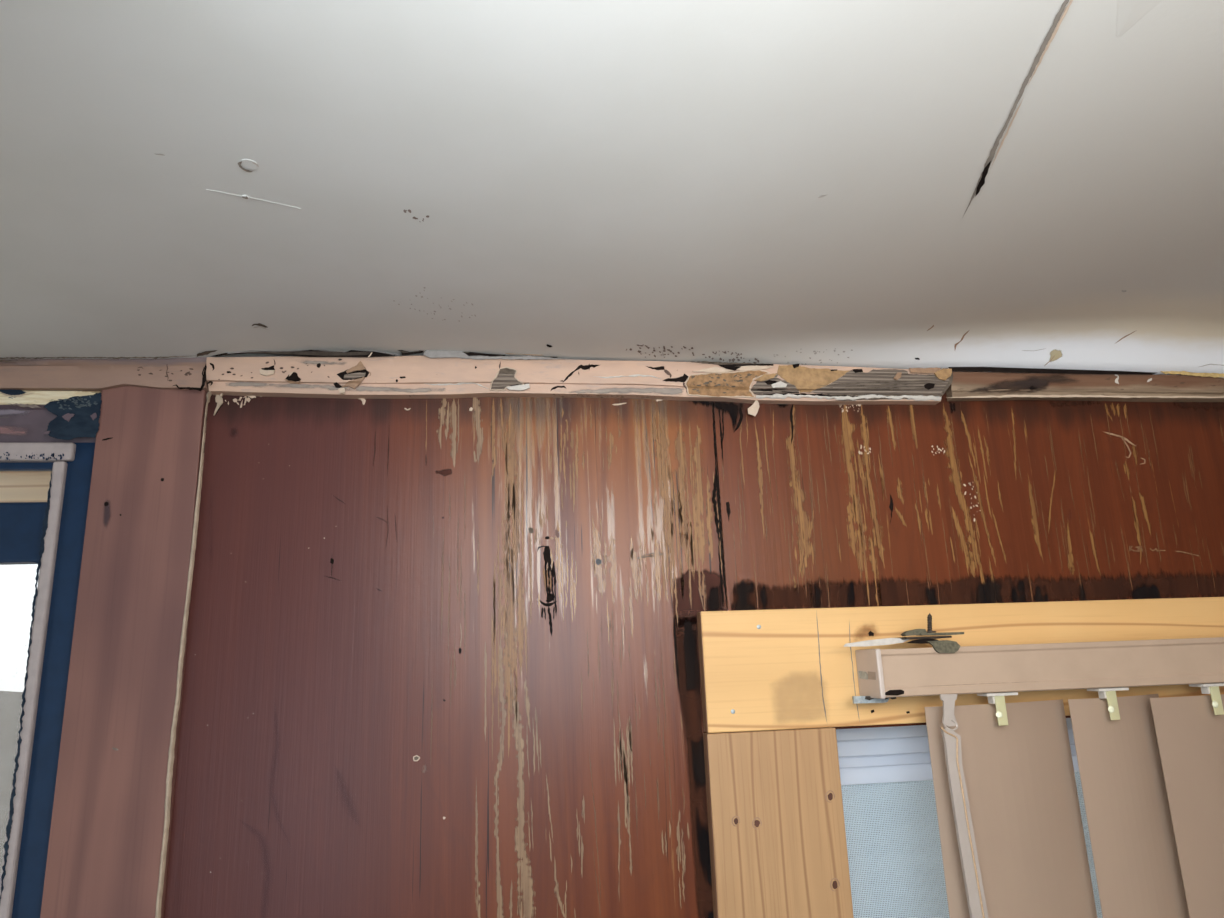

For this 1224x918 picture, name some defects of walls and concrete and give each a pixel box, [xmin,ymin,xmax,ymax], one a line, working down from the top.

crack [963,0,1073,216]
peeling [429,366,530,391]
peeling [685,358,953,416]
leakage [425,397,621,918]
leakage [581,375,1224,918]